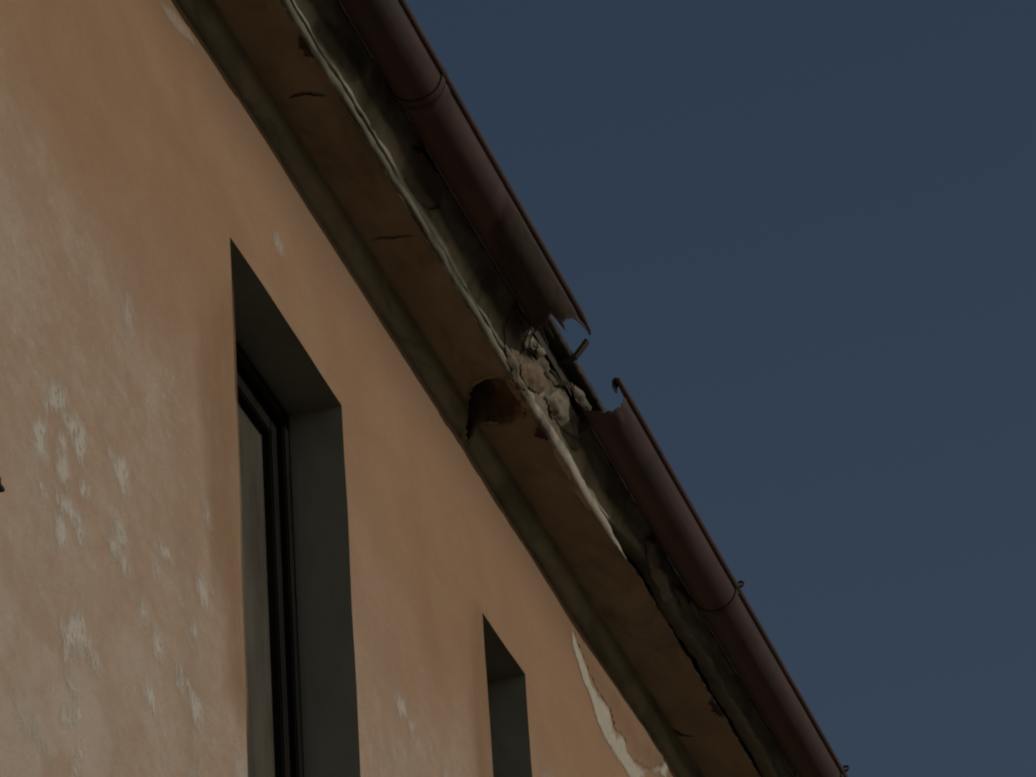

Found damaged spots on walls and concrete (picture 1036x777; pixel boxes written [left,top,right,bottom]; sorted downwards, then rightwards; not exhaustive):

flaking render [461,306,592,451]
peeling [33,381,86,548]
flaking render [572,632,668,777]